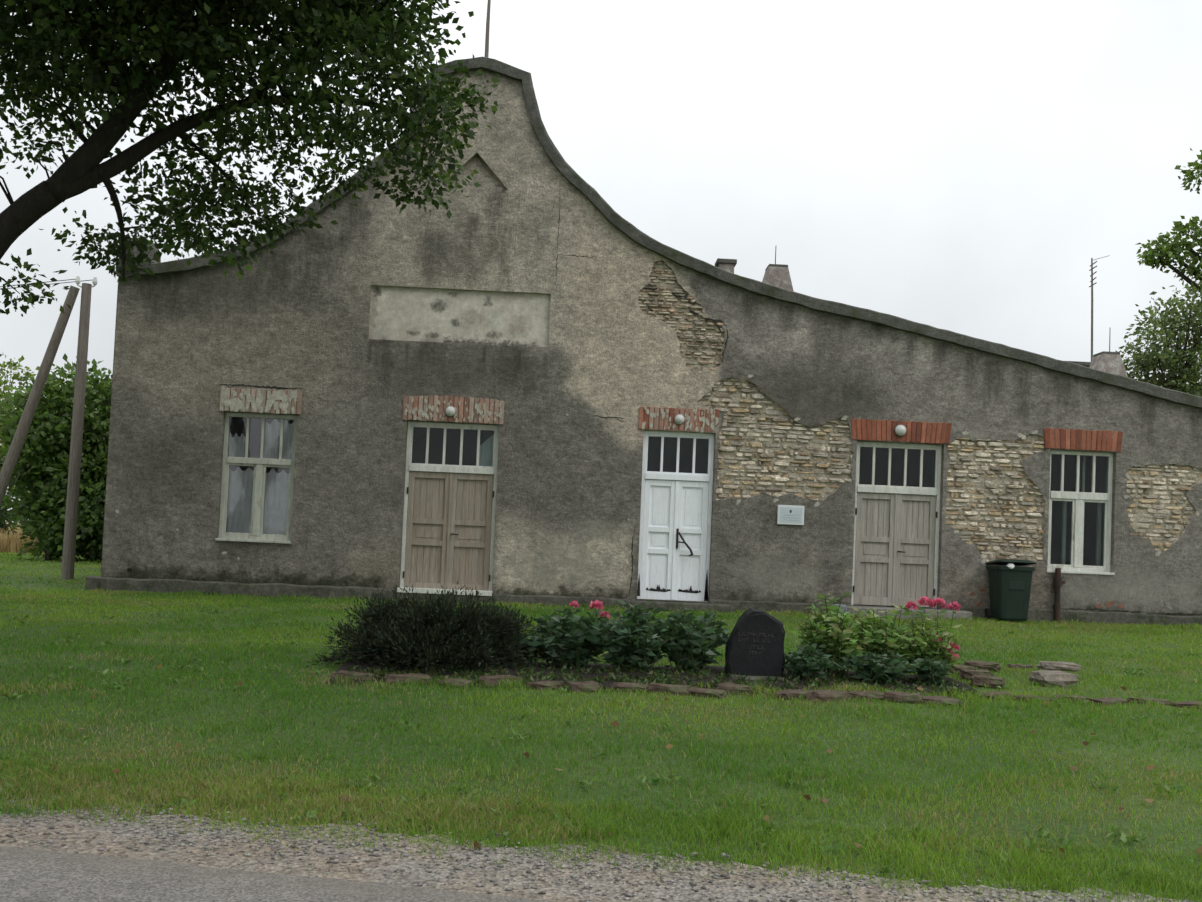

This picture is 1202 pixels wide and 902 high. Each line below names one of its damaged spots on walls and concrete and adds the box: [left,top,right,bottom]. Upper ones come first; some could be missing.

peeling [221,389,298,414]
peeling [404,397,502,422]
spalling [638,260,854,507]
spalling [946,430,1046,564]
spalling [1123,464,1202,556]